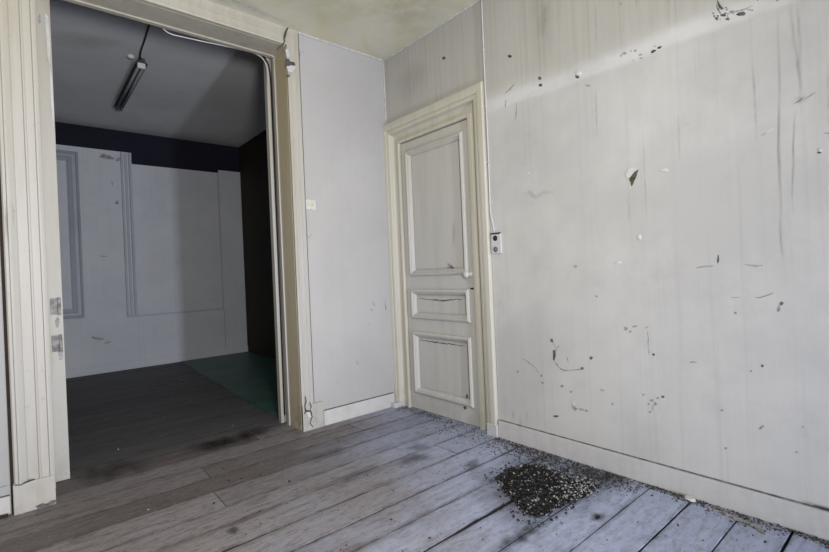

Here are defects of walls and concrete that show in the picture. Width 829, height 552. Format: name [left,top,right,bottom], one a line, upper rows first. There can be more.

flaking render [712,0,758,20]
flaking render [626,167,639,189]